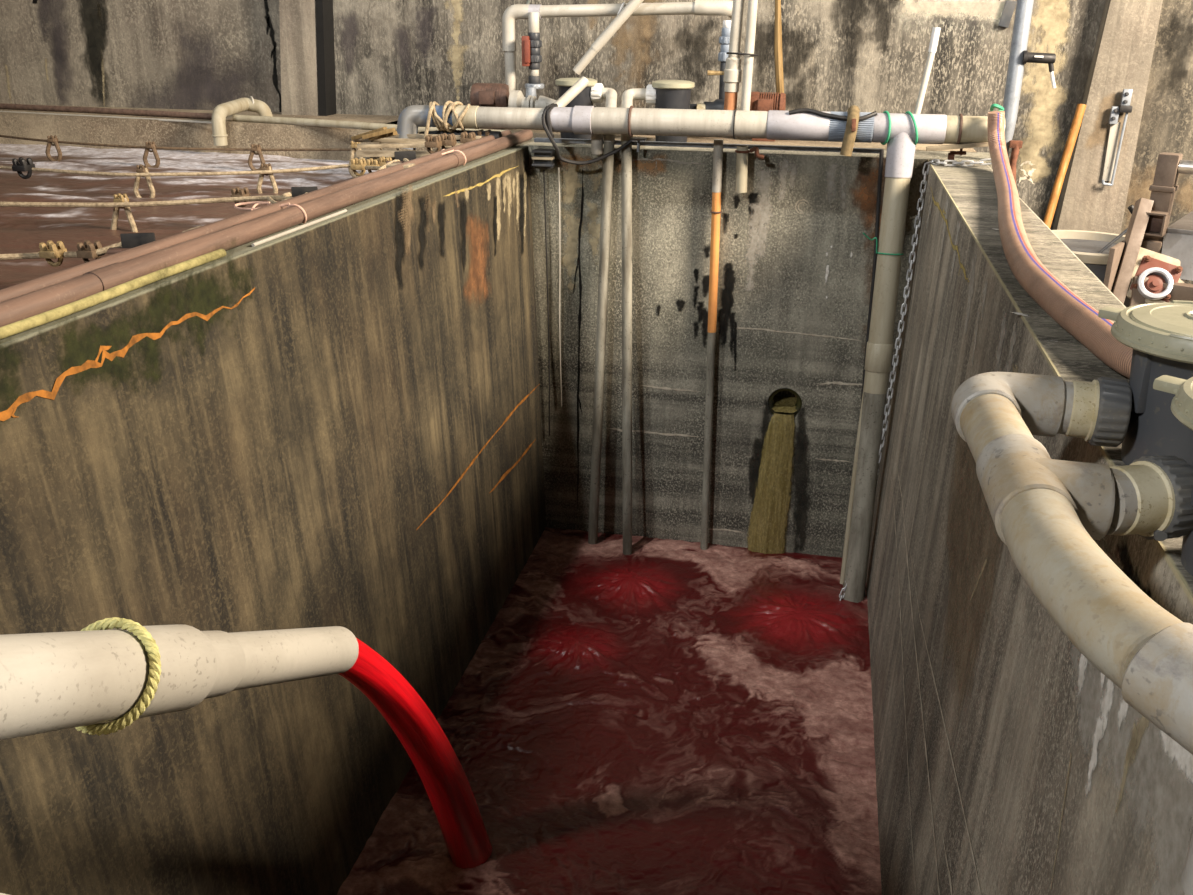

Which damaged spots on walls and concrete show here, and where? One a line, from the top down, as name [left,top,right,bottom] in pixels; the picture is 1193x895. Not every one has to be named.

damp [39,0,69,90]
damp [79,0,109,106]
crack [264,0,282,112]
damp [1167,19,1193,89]
damp [676,160,861,371]
crack [0,287,255,421]